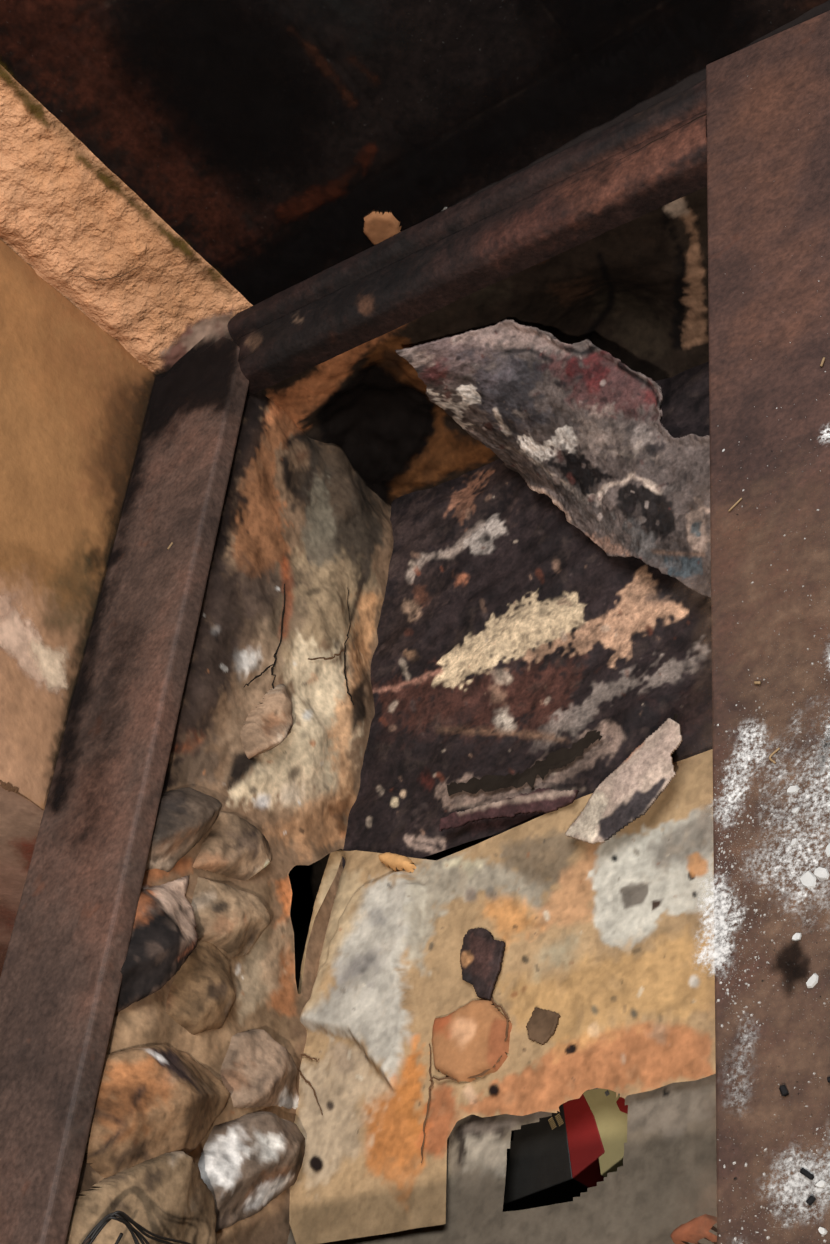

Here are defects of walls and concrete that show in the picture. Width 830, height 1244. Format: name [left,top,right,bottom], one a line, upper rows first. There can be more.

leakage [0,62,48,125]
leakage [76,156,149,216]
leakage [159,226,192,258]
rust [439,788,579,831]